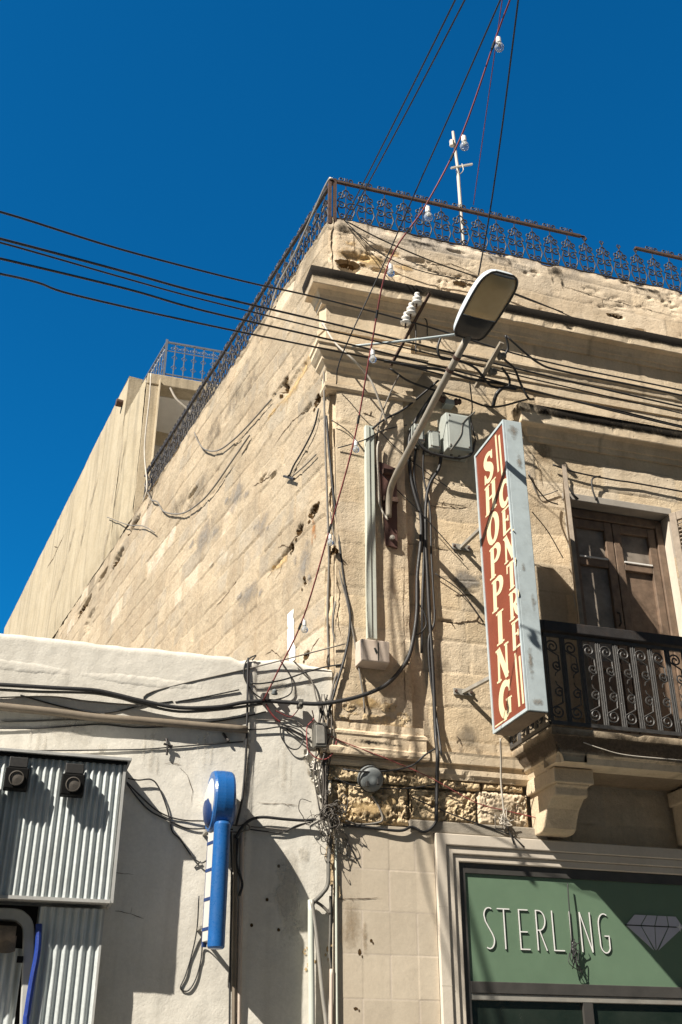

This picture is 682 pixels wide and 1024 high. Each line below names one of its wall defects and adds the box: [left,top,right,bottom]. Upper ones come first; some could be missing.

spalling [334,242,412,271]
spalling [268,351,311,420]
spalling [272,501,319,569]